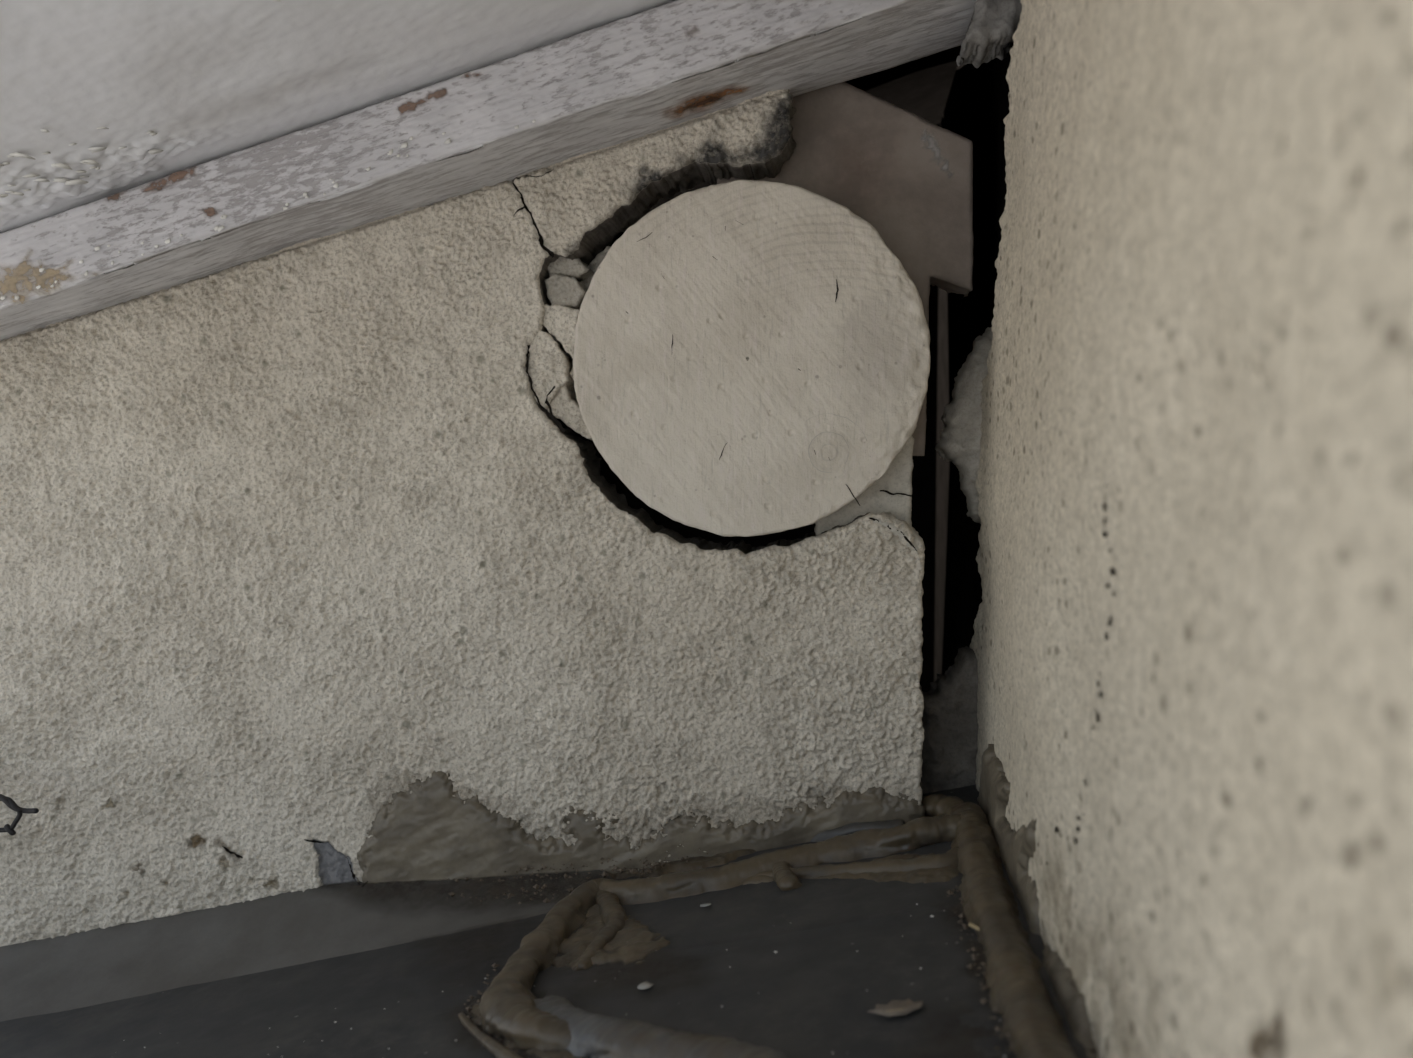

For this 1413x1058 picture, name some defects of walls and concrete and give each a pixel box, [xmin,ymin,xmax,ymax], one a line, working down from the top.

corrosion [668,88,745,116]
crack [513,169,554,258]
crack [525,345,566,432]
spalling [313,839,357,885]